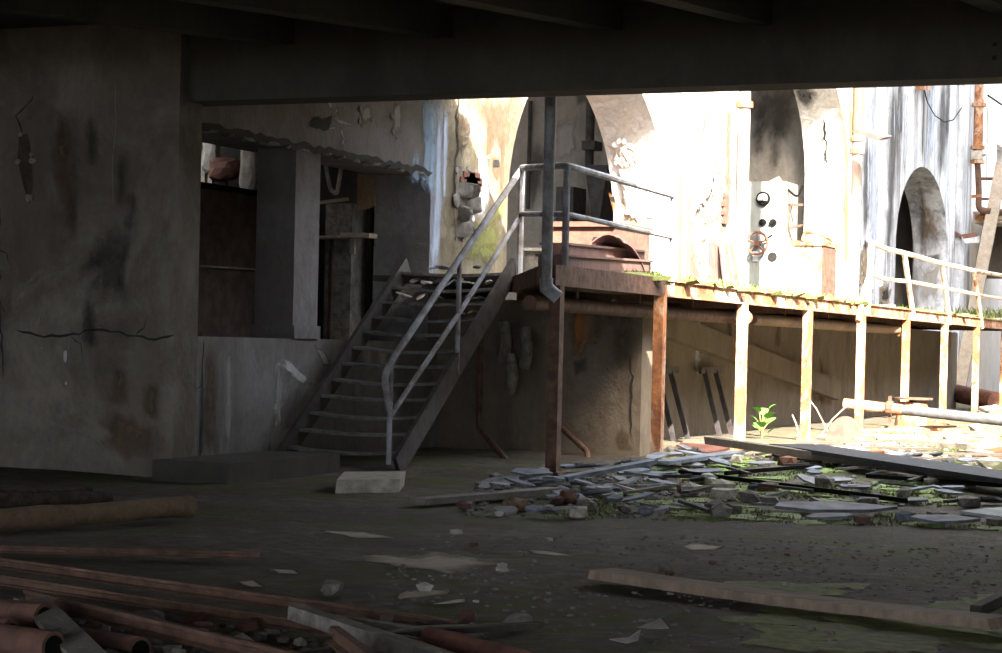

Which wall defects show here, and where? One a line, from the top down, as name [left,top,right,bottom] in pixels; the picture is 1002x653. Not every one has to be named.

flaking render [612,138,640,170]
crack [823,118,834,177]
flaking render [691,159,730,269]
leakage [867,85,955,297]
corrosion [675,439,730,453]